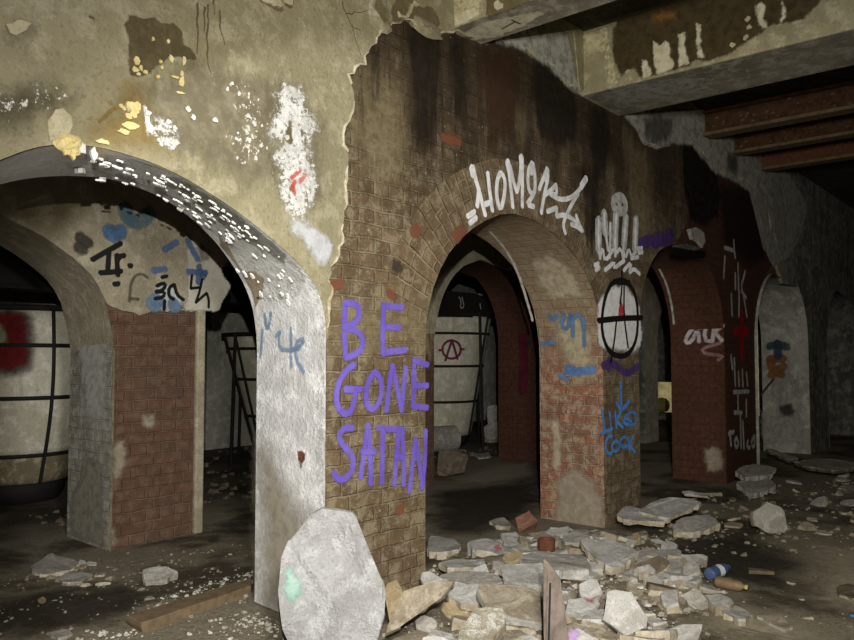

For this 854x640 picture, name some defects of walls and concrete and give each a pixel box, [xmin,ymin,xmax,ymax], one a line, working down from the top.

water stain [409,30,439,147]
water stain [533,31,581,144]
peeling [117,0,778,591]